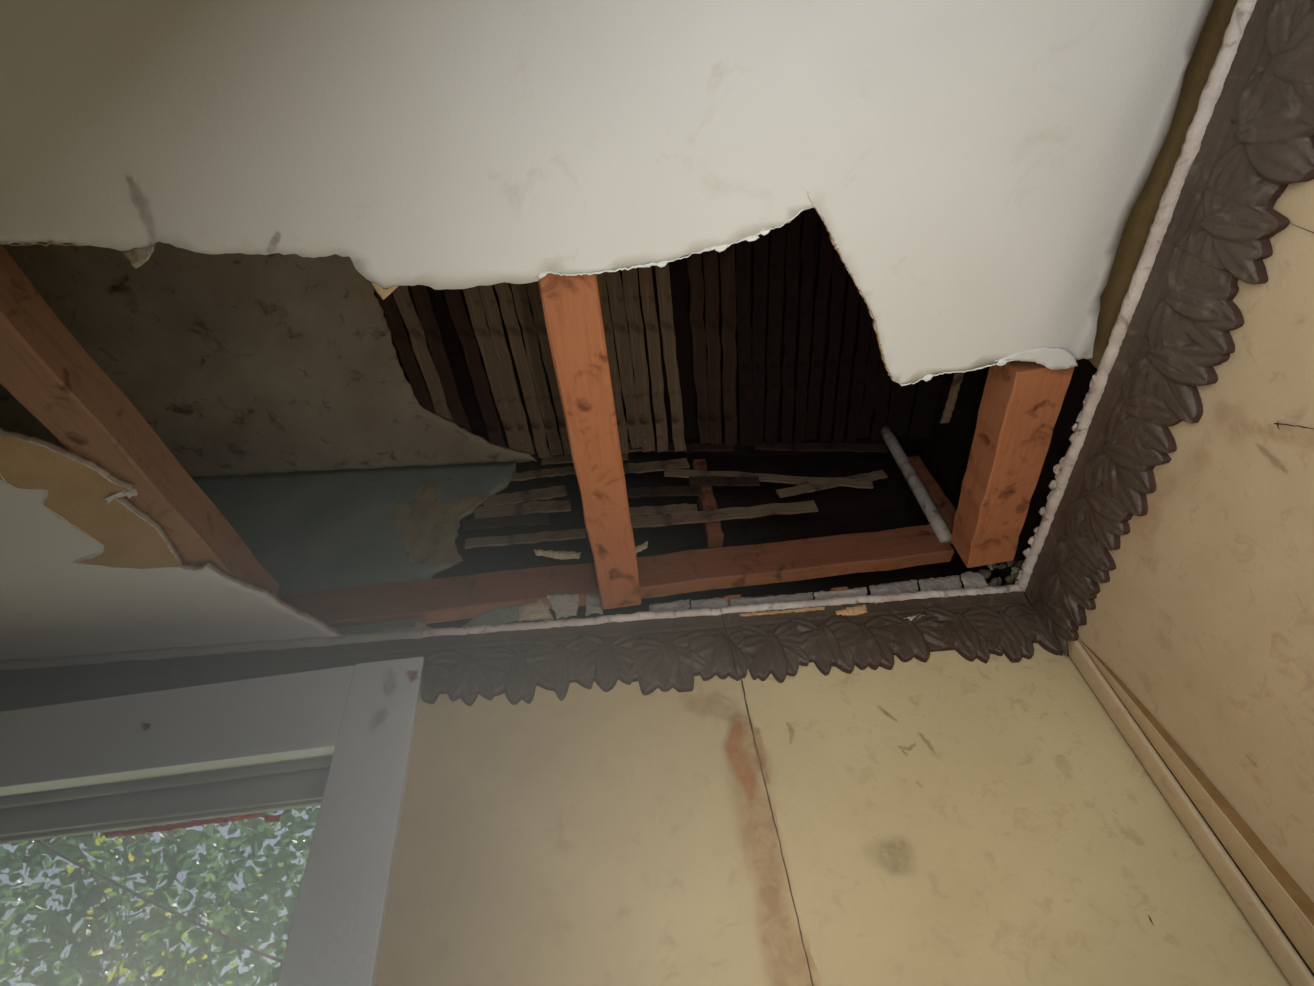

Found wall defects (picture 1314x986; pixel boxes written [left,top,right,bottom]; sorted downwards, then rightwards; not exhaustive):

peeling [121,244,156,268]
peeling [371,282,399,300]
spalling [536,207,1014,386]
peeling [0,435,183,569]
spalling [1015,375,1096,584]
spalling [462,594,603,627]
spalling [649,571,988,617]
crack [736,677,814,986]